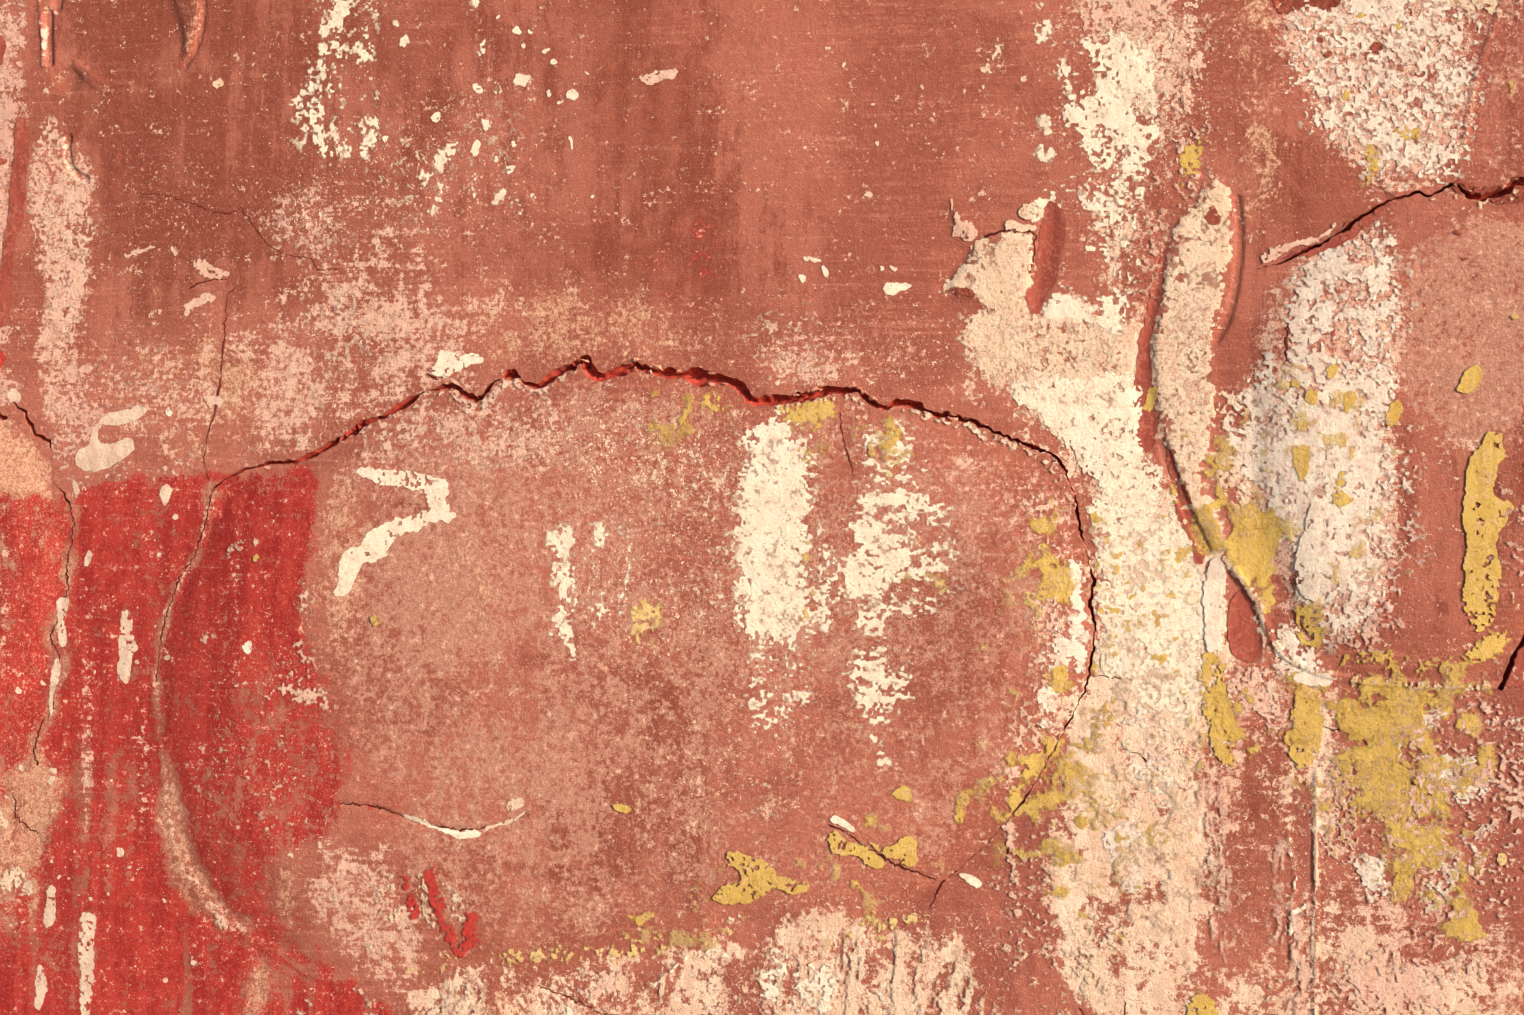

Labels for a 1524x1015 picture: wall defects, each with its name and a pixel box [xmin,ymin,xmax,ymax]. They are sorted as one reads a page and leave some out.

peeling [0,0,98,339]
peeling [289,0,534,230]
crack [1276,177,1524,265]
crack [0,404,51,443]
crack [33,491,75,766]
peeling [245,350,581,596]
peeling [545,522,663,661]
crack [155,278,1205,909]
peeling [626,0,1524,1015]
crack [1283,320,1291,375]
crack [1497,634,1524,688]
peeling [493,851,809,1015]